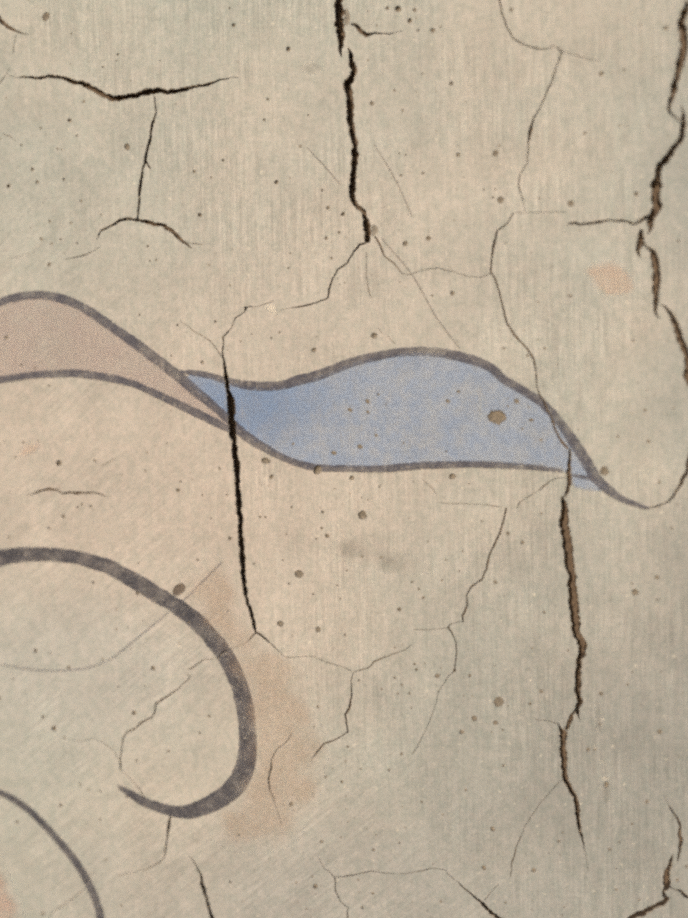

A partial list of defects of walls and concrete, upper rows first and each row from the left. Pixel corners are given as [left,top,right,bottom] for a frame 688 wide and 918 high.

crack [0,16,236,259]
crack [567,0,688,385]
crack [26,488,108,498]
crack [73,0,599,918]
crack [649,457,688,508]
crack [628,797,688,918]